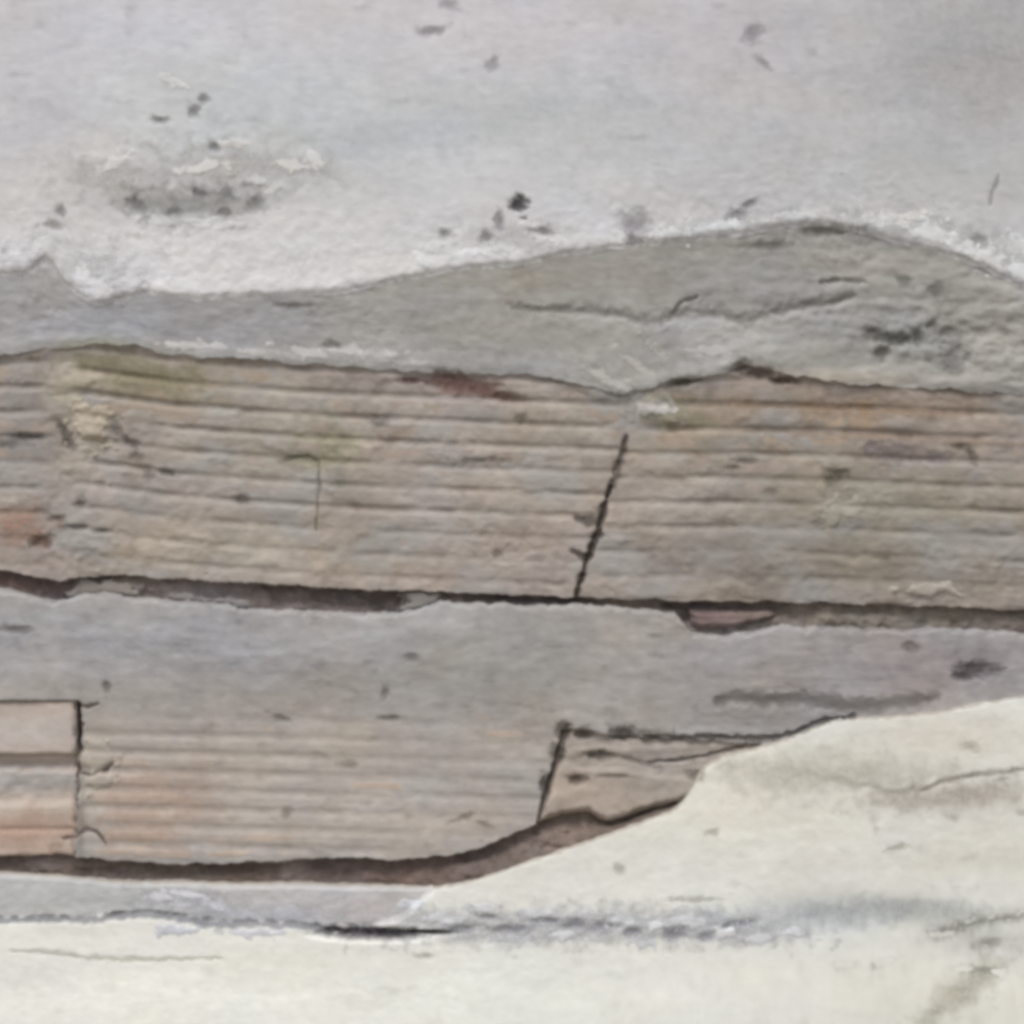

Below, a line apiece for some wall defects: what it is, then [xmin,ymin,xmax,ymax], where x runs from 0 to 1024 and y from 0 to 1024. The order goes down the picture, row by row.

flaking render [157,137,334,204]
spalling [0,196,1024,865]
crack [571,434,628,599]
crack [64,703,114,843]
crack [542,724,568,799]
crack [643,714,856,742]
flaking render [136,885,314,942]
flaking render [388,899,823,951]